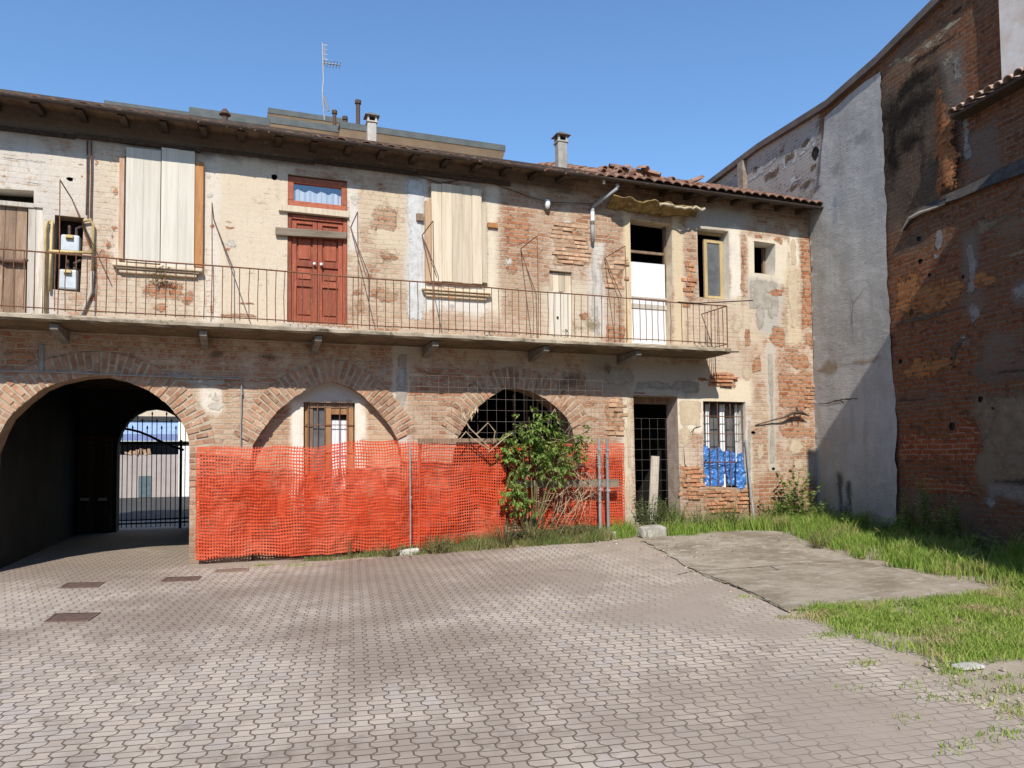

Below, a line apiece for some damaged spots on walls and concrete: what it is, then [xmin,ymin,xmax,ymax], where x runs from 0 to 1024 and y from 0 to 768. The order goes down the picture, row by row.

flaking render [748,133,817,192]
damp [886,130,920,176]
flaking render [353,178,425,321]
spalling [503,214,629,289]
flaking render [730,244,815,409]
flaking render [582,355,761,514]
flaking render [779,426,815,471]